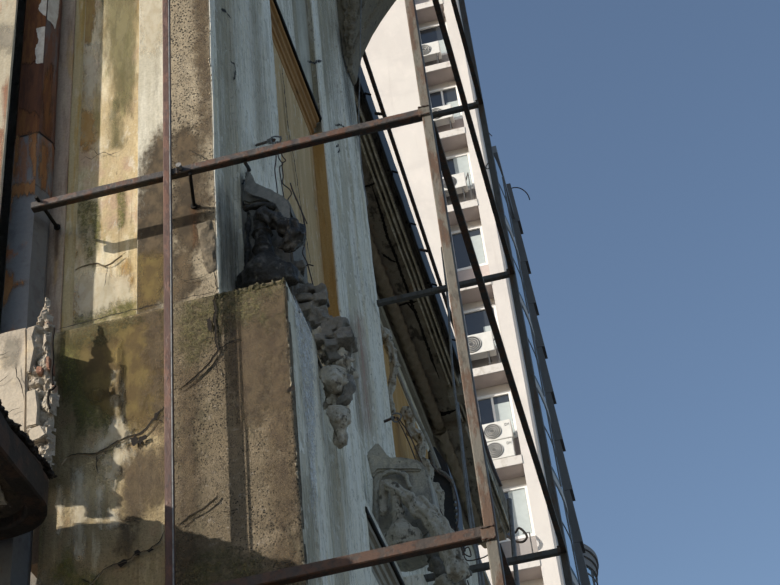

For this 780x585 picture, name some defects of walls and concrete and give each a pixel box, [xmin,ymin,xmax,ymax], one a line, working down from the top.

peeling [35,0,59,64]
corrosion [10,0,51,215]
crack [75,252,126,286]
crack [57,271,239,389]
spalling [294,259,358,364]
spalling [0,297,60,481]
leakage [57,254,165,555]
crack [61,407,164,471]
crack [82,495,237,585]